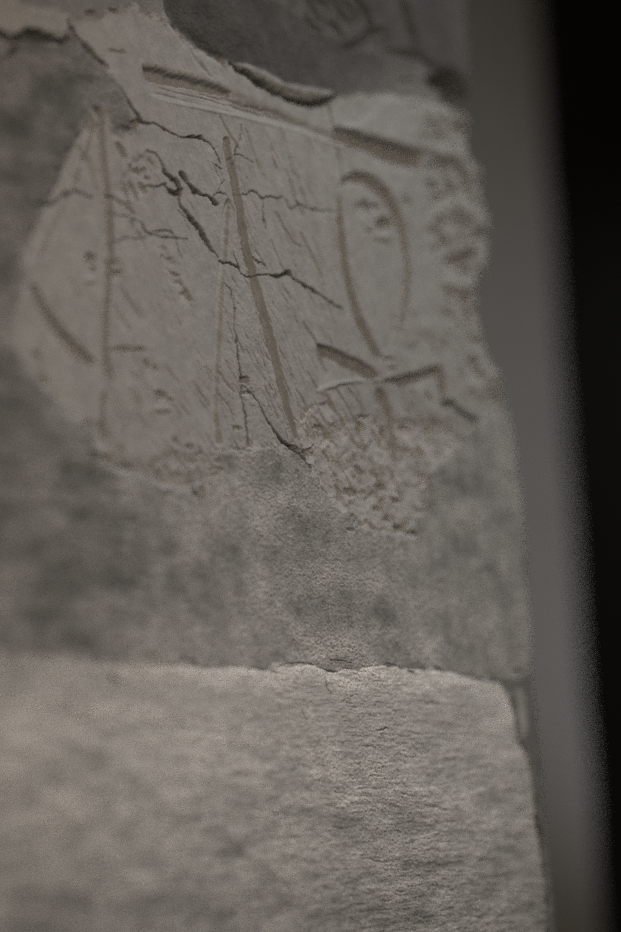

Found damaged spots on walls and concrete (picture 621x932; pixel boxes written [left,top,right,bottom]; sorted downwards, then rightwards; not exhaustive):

crack [0,18,110,69]
crack [31,87,344,470]
spalling [290,401,458,538]